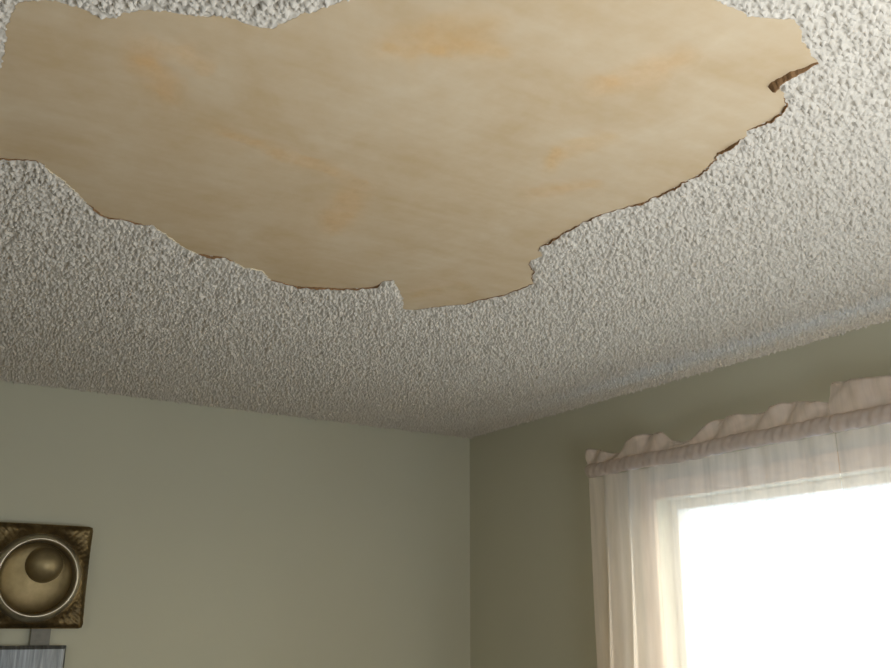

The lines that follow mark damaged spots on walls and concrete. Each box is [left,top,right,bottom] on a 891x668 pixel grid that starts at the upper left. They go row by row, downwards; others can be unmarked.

peeling [0,0,819,310]